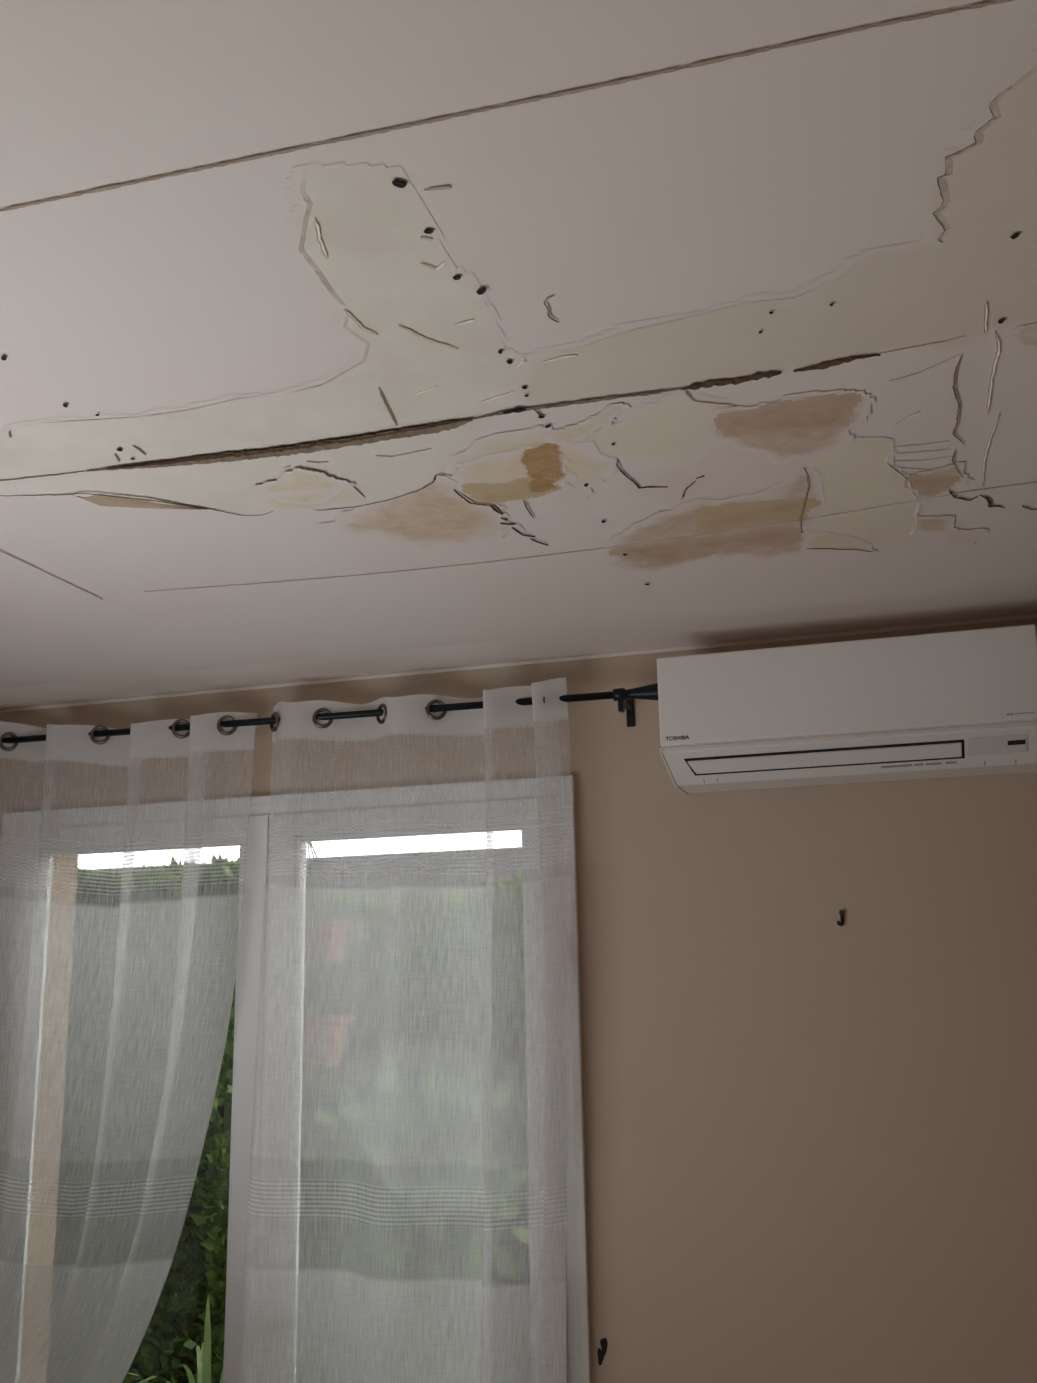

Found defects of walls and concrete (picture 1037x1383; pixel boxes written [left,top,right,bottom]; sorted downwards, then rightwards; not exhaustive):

crack [0,0,1014,211]
crack [544,294,559,322]
crack [0,550,103,600]
damp [252,403,630,551]
crack [0,335,1037,592]
damp [603,389,877,575]
damp [905,462,988,548]